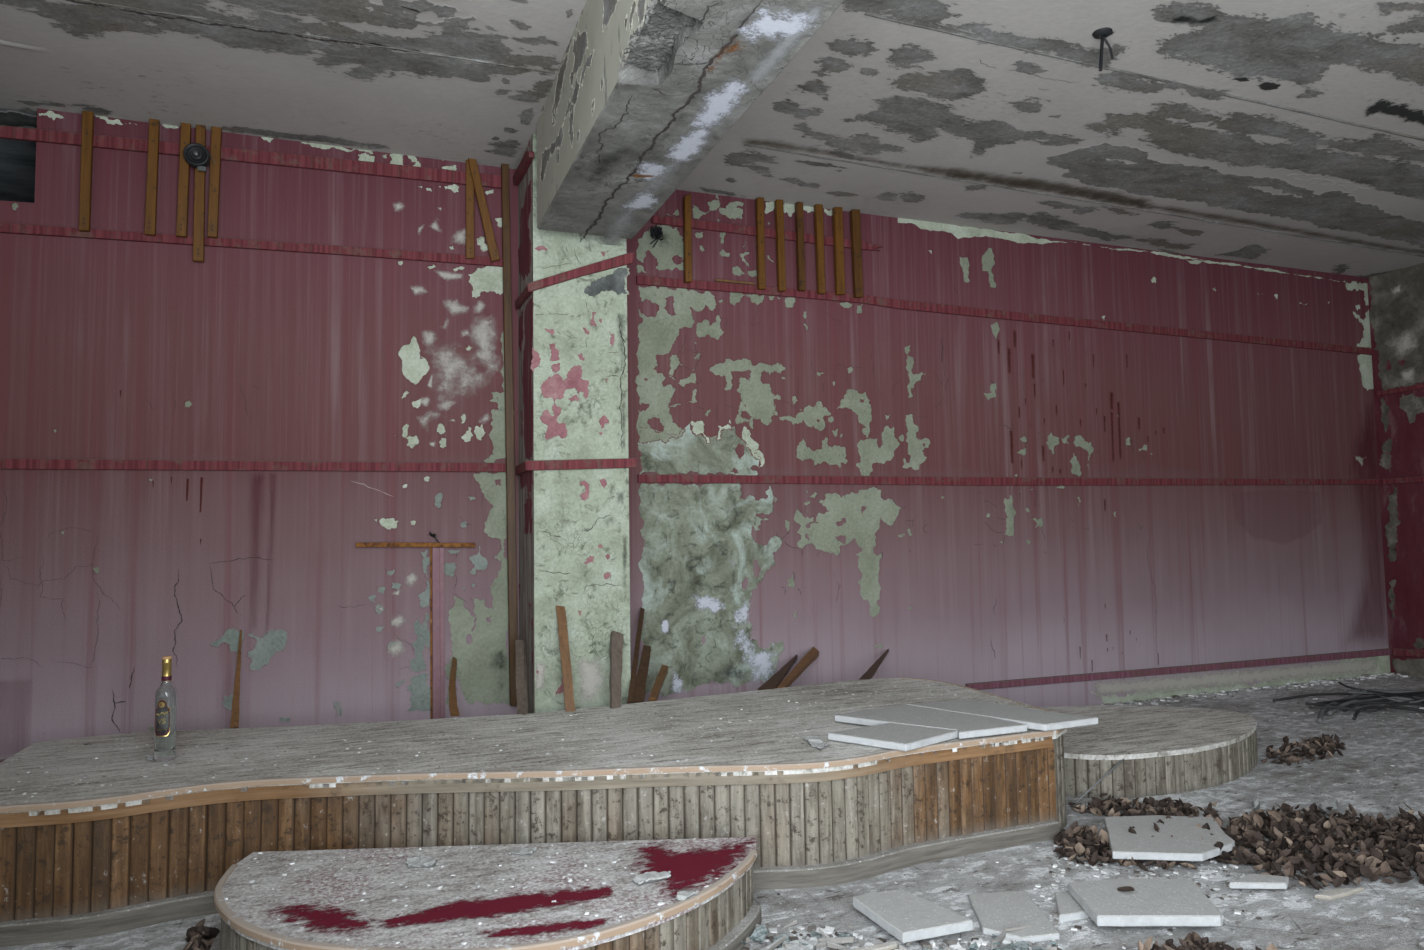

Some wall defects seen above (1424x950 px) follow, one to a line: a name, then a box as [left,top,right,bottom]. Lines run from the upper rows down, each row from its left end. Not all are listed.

peeling [0,0,690,279]
peeling [427,216,503,299]
peeling [582,0,1424,619]
crack [172,557,272,665]
peeling [0,297,964,802]
spalling [1087,637,1424,704]